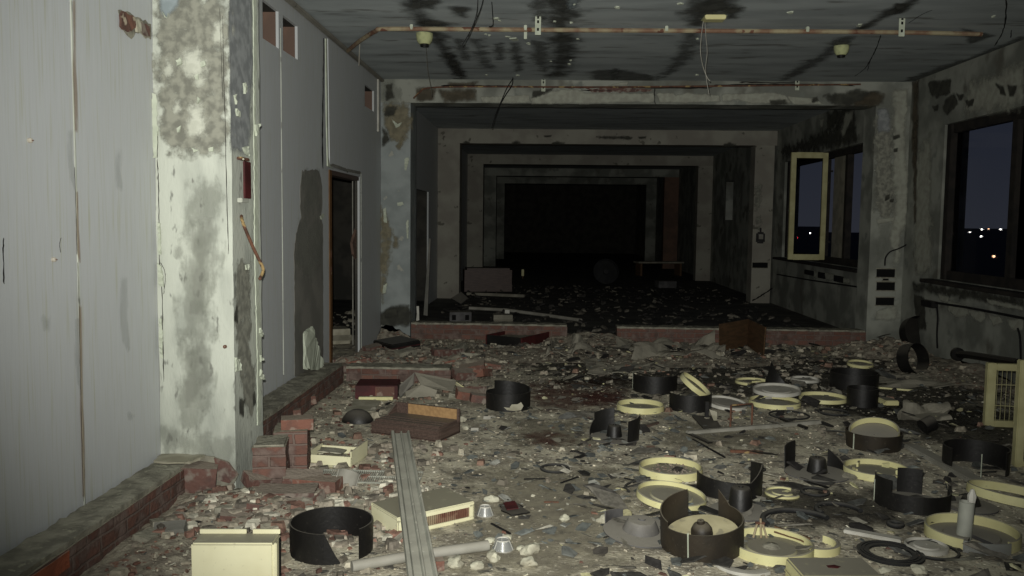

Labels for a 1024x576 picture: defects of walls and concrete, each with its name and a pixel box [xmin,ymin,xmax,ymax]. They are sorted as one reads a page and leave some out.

peeling [365,86,413,170]
water stain [403,0,579,102]
water stain [591,0,742,81]
peeling [928,62,1024,115]
peeling [118,0,295,425]